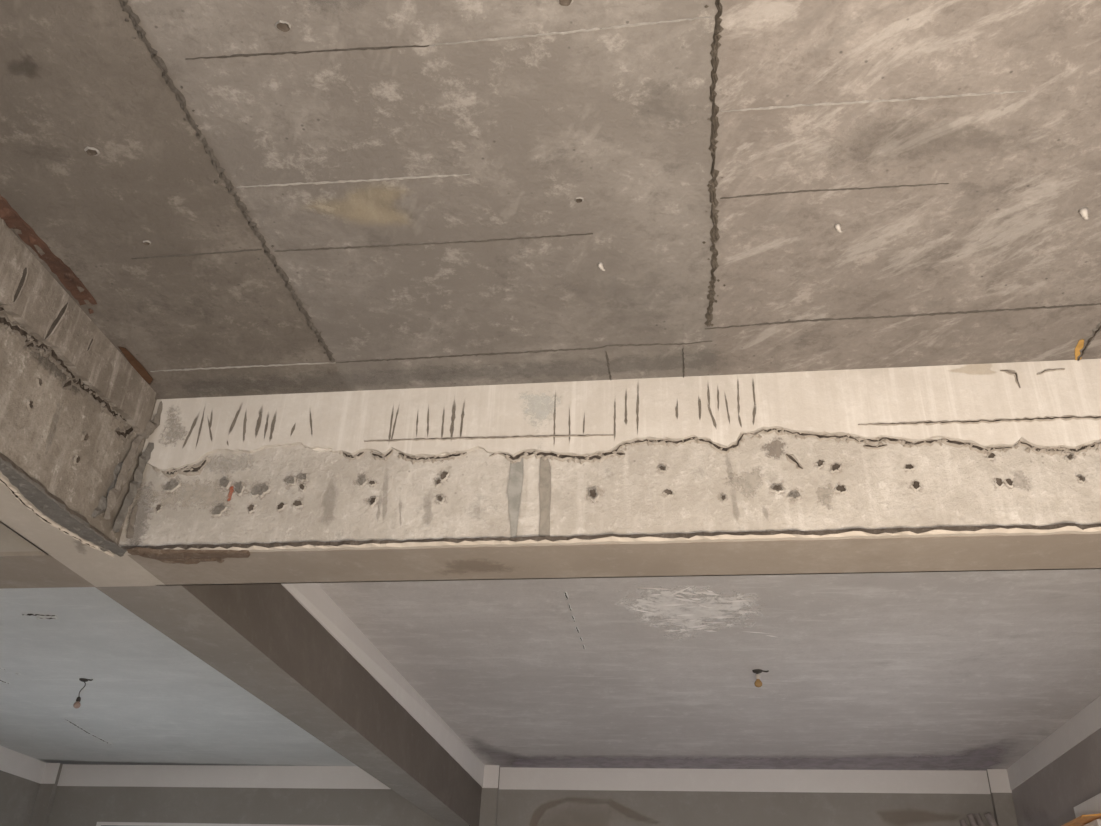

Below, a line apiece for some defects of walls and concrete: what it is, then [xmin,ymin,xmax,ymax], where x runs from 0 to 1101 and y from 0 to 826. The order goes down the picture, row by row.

flaking render [0,195,97,341]
crack [0,305,134,443]
corrosion [119,347,154,385]
crack [1000,322,1101,388]
crack [340,415,1101,470]
spalling [0,452,1101,564]